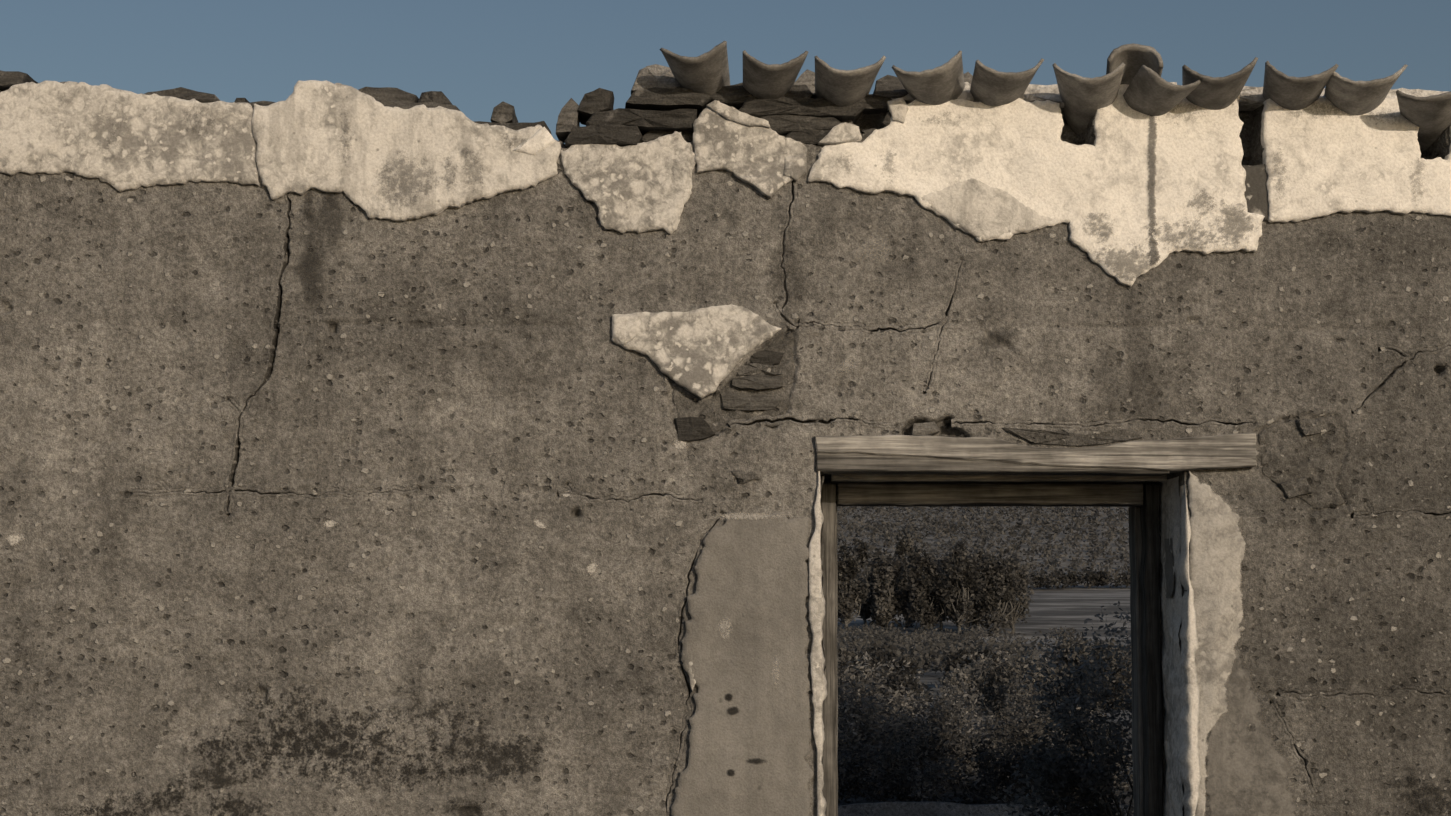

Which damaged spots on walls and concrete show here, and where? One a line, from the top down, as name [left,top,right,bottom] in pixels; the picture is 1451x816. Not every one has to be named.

crack [126,193,420,514]
flaking render [611,304,794,441]
crack [728,413,896,429]
crack [773,180,1255,430]
crack [1352,343,1451,414]
leakage [64,687,542,816]
flaking render [671,512,814,816]
flaking render [1204,642,1298,816]